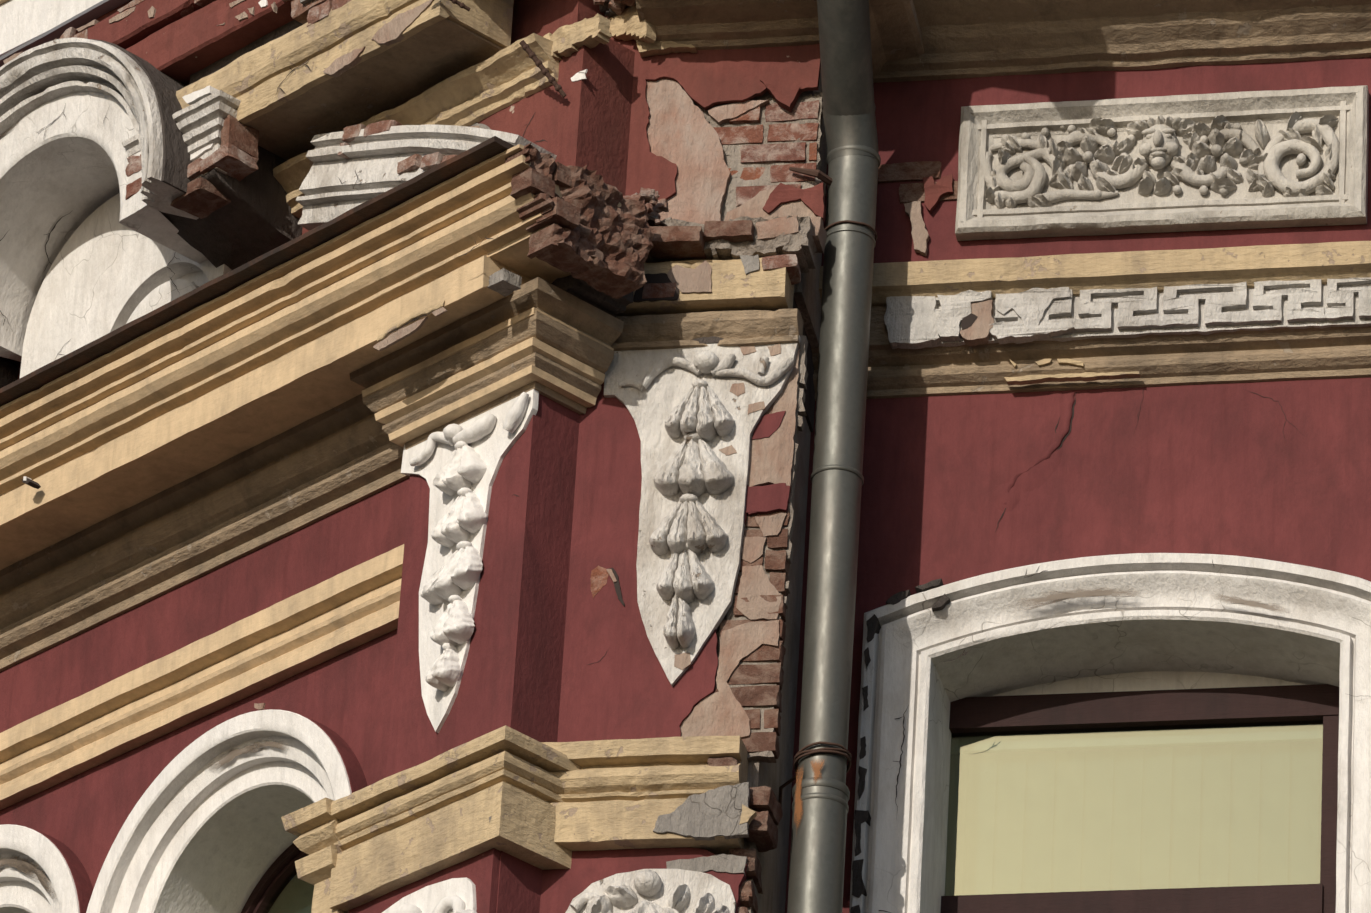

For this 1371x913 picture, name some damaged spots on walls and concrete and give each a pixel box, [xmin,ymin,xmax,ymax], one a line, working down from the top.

flaking render [55,0,351,40]
spalling [543,0,697,61]
flaking render [125,154,142,200]
flaking render [170,114,259,219]
spalling [646,79,826,224]
flaking render [878,161,958,256]
peeling [633,260,712,302]
spalling [884,287,1140,386]
crack [995,390,1076,532]
spalling [680,335,808,766]
rust [794,761,824,824]
spalling [653,782,783,913]